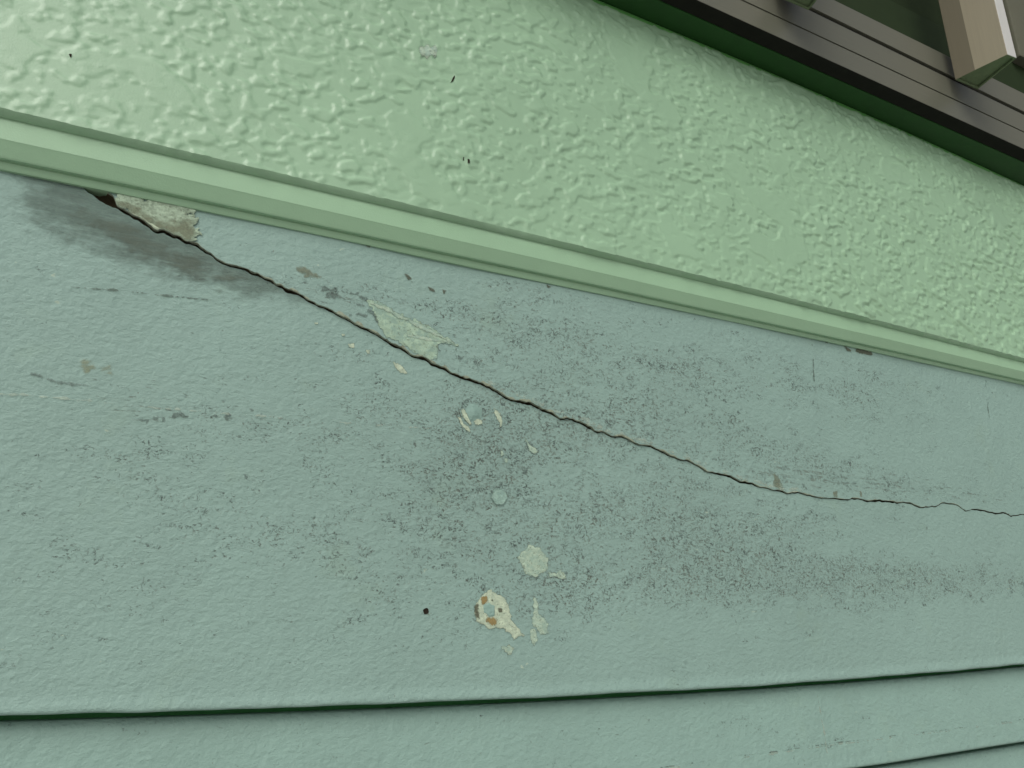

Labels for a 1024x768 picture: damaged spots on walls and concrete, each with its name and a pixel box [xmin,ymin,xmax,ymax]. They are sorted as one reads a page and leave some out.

spalling [115,194,202,241]
peeling [367,300,459,360]
crack [93,192,1024,517]
peeling [517,544,566,579]
peeling [474,589,549,655]